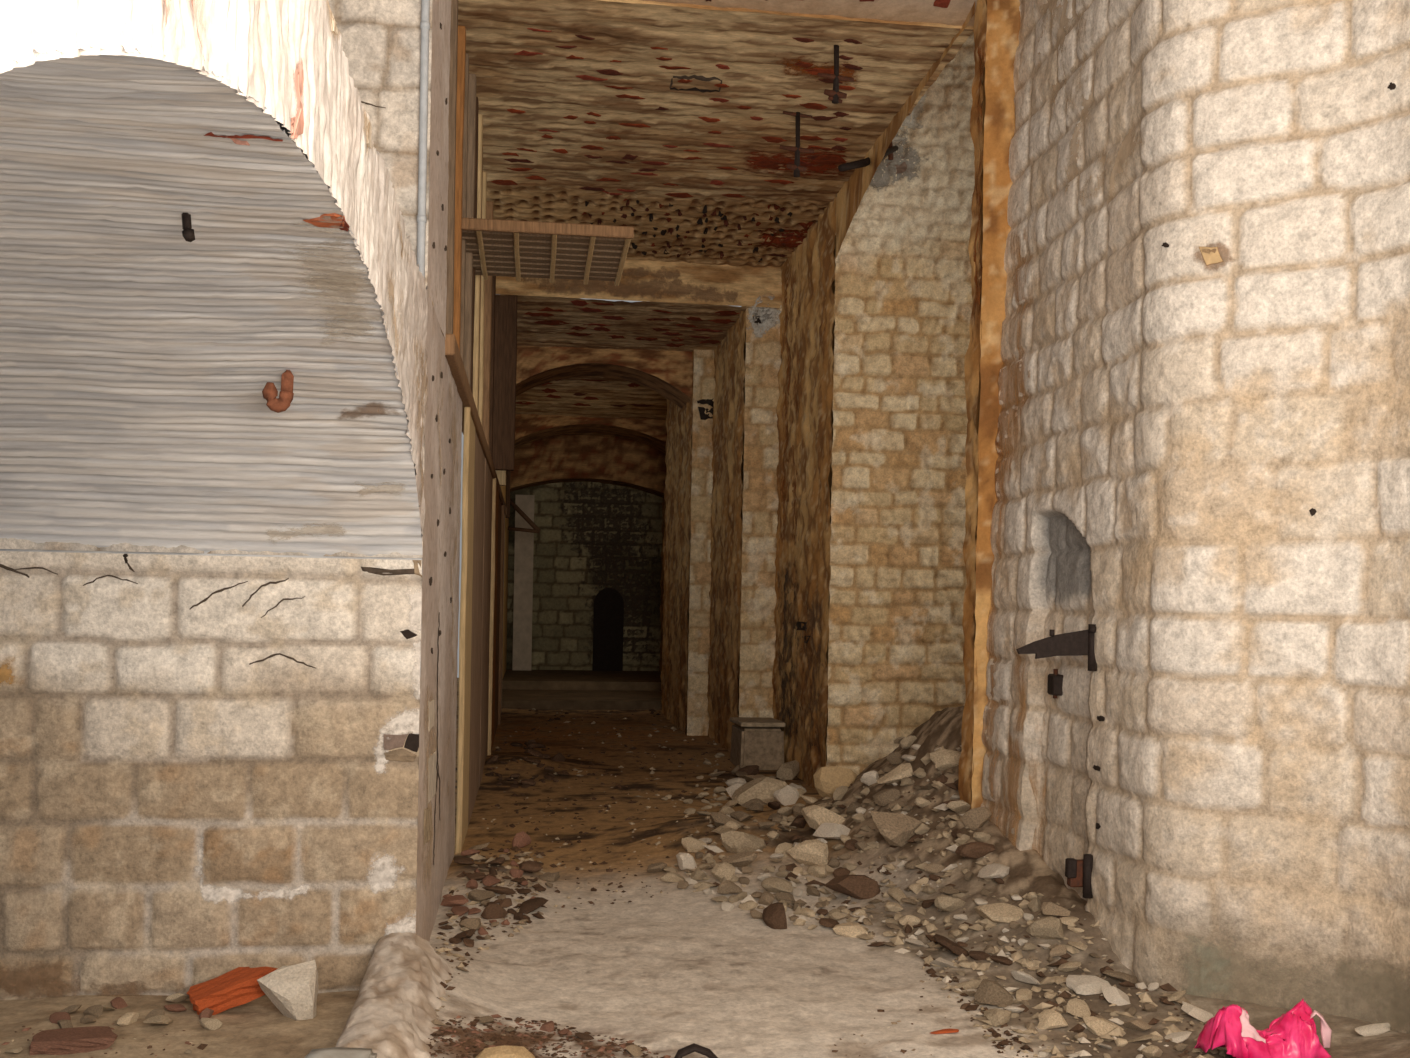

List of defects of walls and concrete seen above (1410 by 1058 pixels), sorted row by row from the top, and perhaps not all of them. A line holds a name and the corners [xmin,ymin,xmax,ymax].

crack [0,554,138,586]
crack [190,578,305,618]
crack [249,653,315,668]